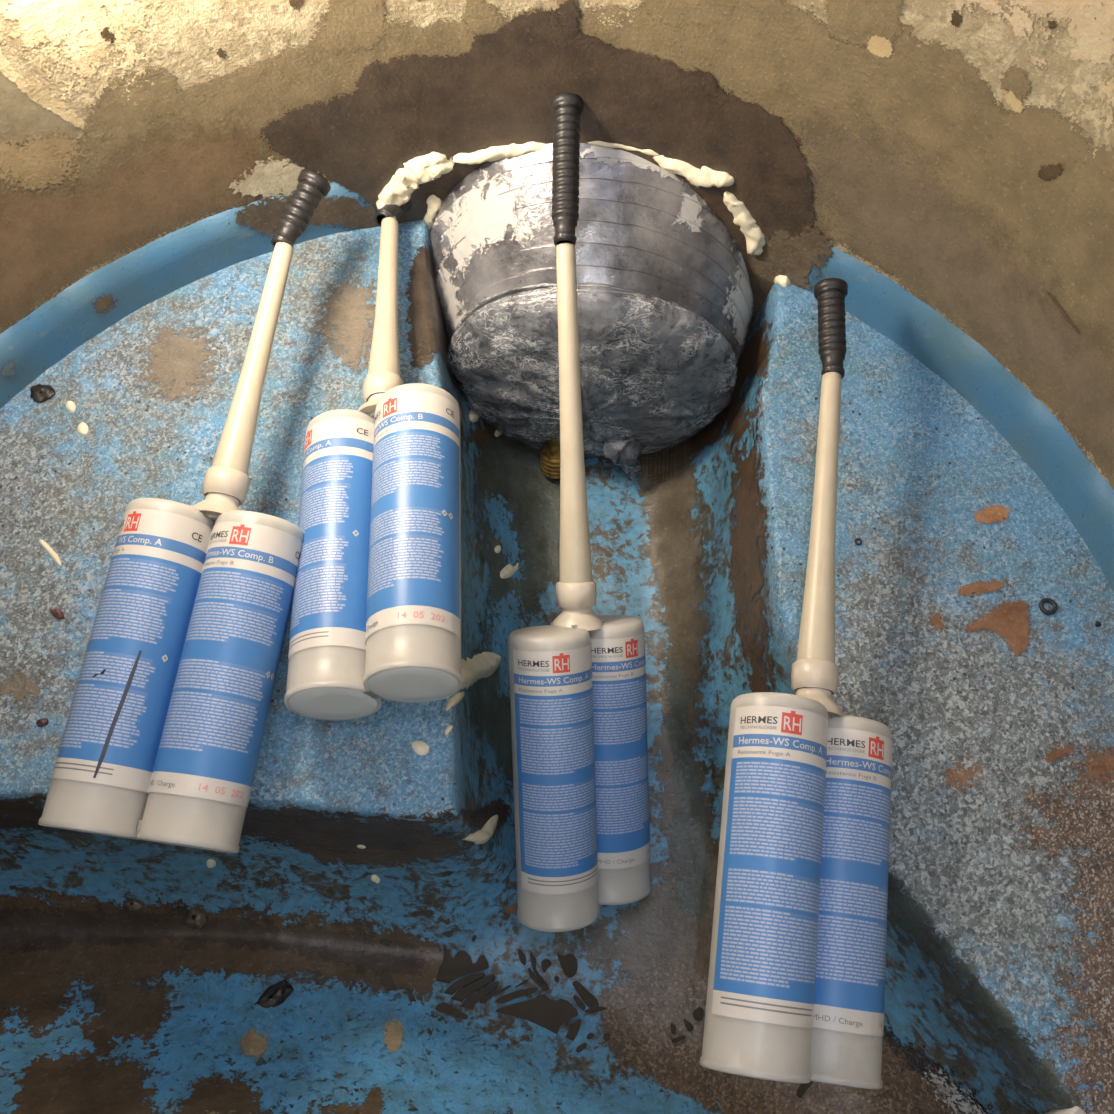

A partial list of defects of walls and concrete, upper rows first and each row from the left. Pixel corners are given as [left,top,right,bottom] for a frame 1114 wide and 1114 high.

leakage [0,0,1114,490]
corrosion [972,504,1011,525]
peeling [0,885,455,1114]